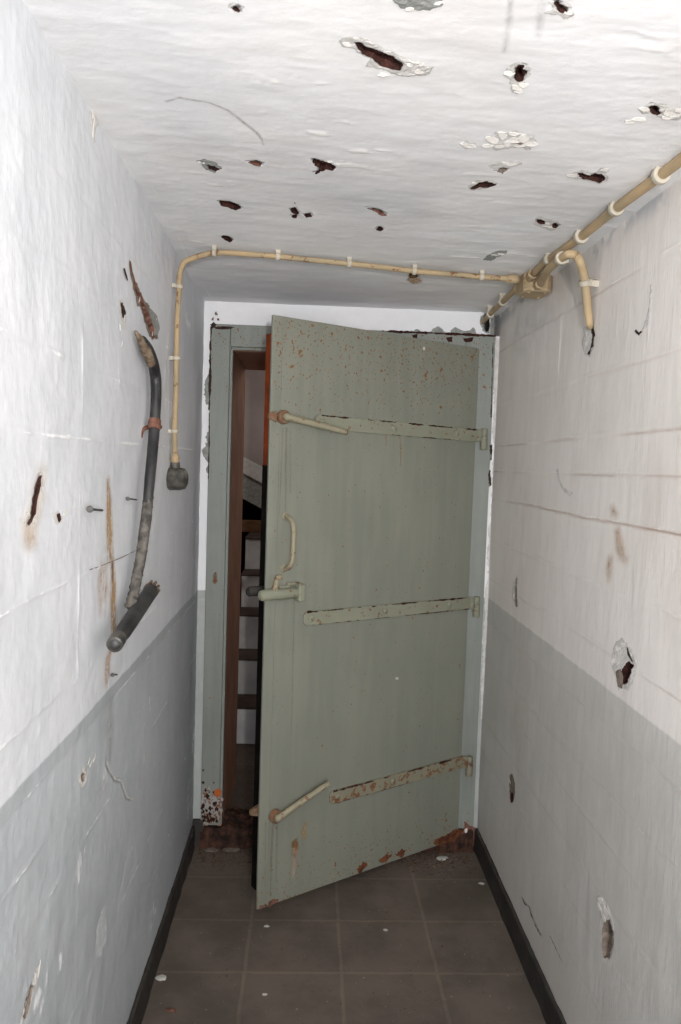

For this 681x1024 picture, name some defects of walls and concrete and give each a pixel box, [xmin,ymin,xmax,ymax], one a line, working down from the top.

spalling [339,36,434,77]
spalling [503,62,531,94]
spalling [625,102,681,124]
spalling [197,159,222,173]
spalling [312,158,335,174]
peeling [460,130,538,191]
spalling [567,168,609,184]
rust [107,484,116,633]
spalling [611,638,637,691]
rust [200,769,223,826]
rust [433,822,475,846]
spalling [597,896,614,963]